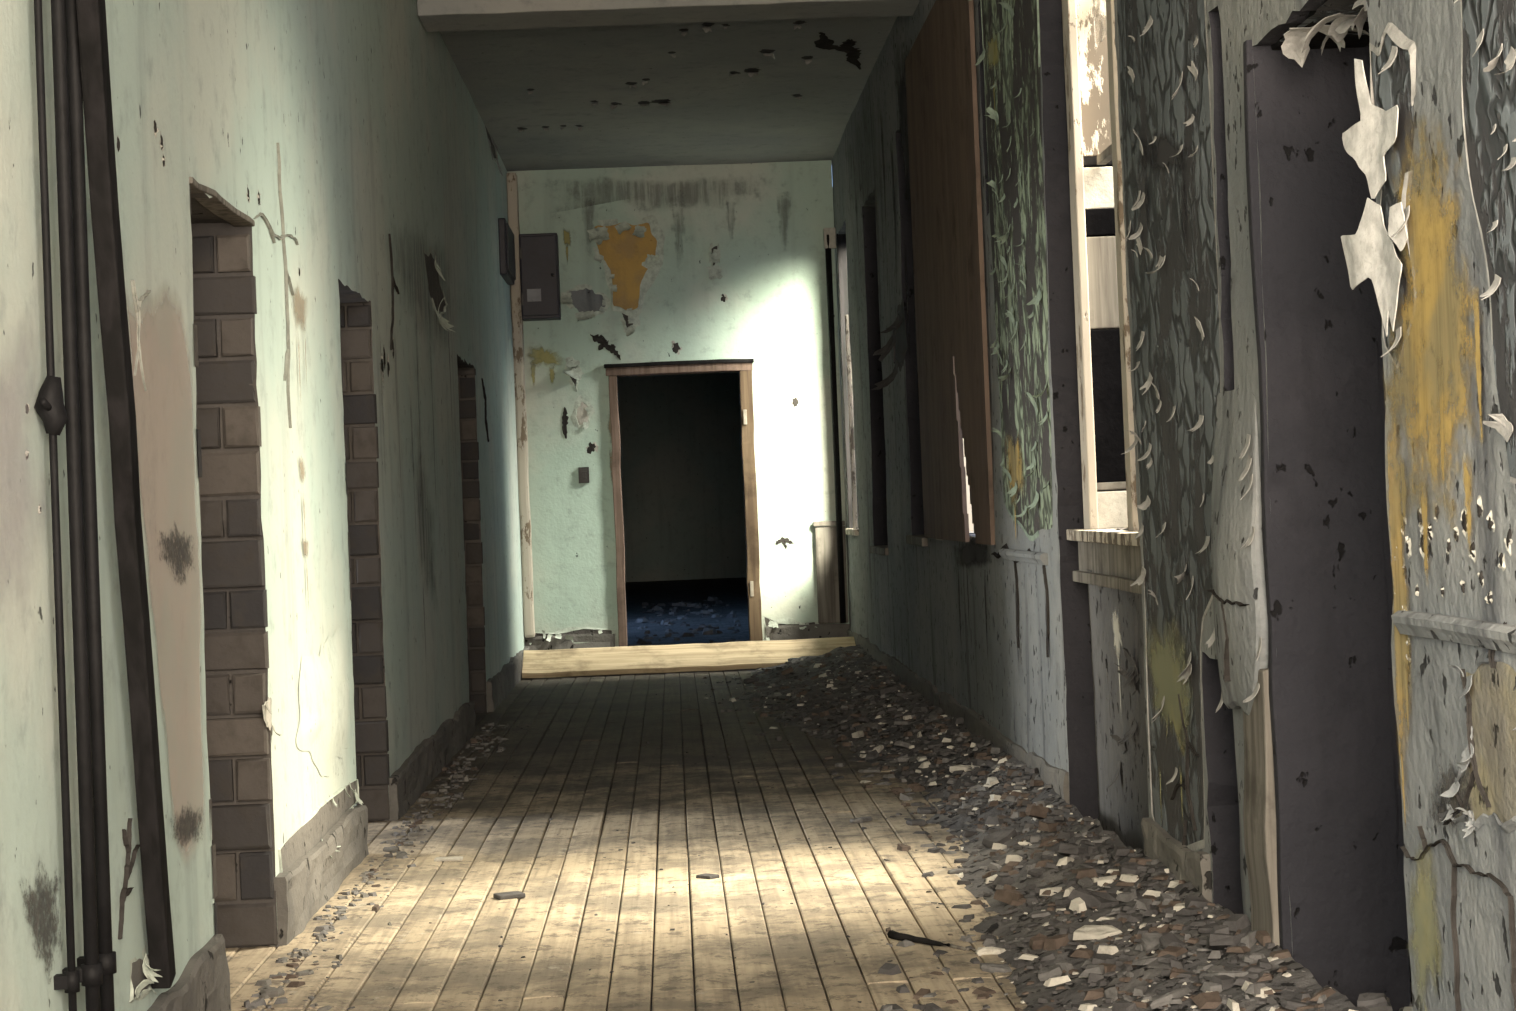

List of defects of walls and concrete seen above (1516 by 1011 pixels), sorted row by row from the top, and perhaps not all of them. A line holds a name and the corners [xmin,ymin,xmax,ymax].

crack [253,143,299,428]
peeling [561,215,665,337]
peeling [591,78,672,110]
peeling [1087,0,1221,851]
peeling [1280,0,1417,369]
water stain [1387,124,1483,571]
peeling [1454,0,1516,484]
crack [1170,694,1200,845]
crack [1400,649,1516,1011]
spalling [1439,650,1516,838]